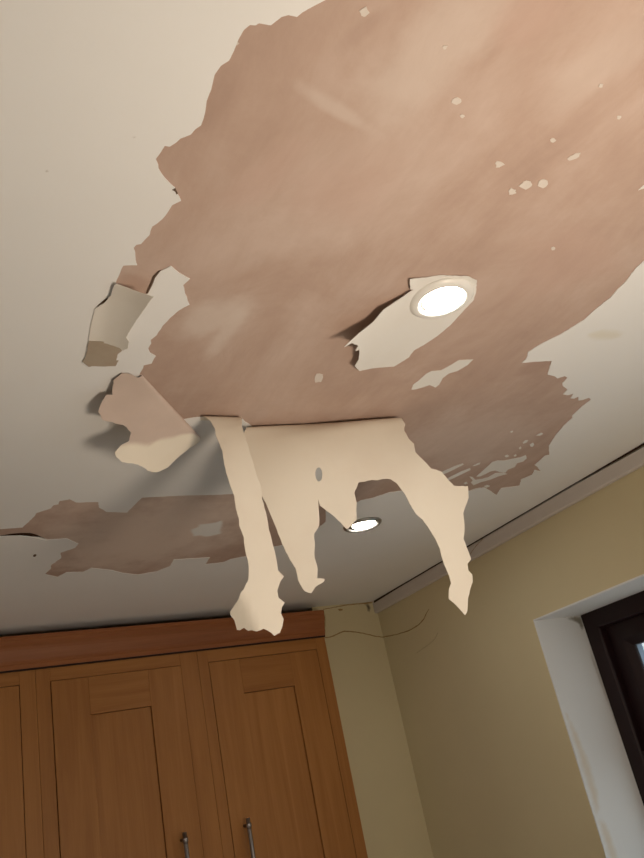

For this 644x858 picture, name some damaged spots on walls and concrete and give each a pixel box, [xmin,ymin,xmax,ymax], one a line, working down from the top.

peeling [82,0,644,495]
peeling [0,494,246,577]
peeling [262,497,282,547]
peeling [318,501,326,526]
peeling [355,479,402,502]
crack [467,443,644,554]
crack [323,561,443,653]